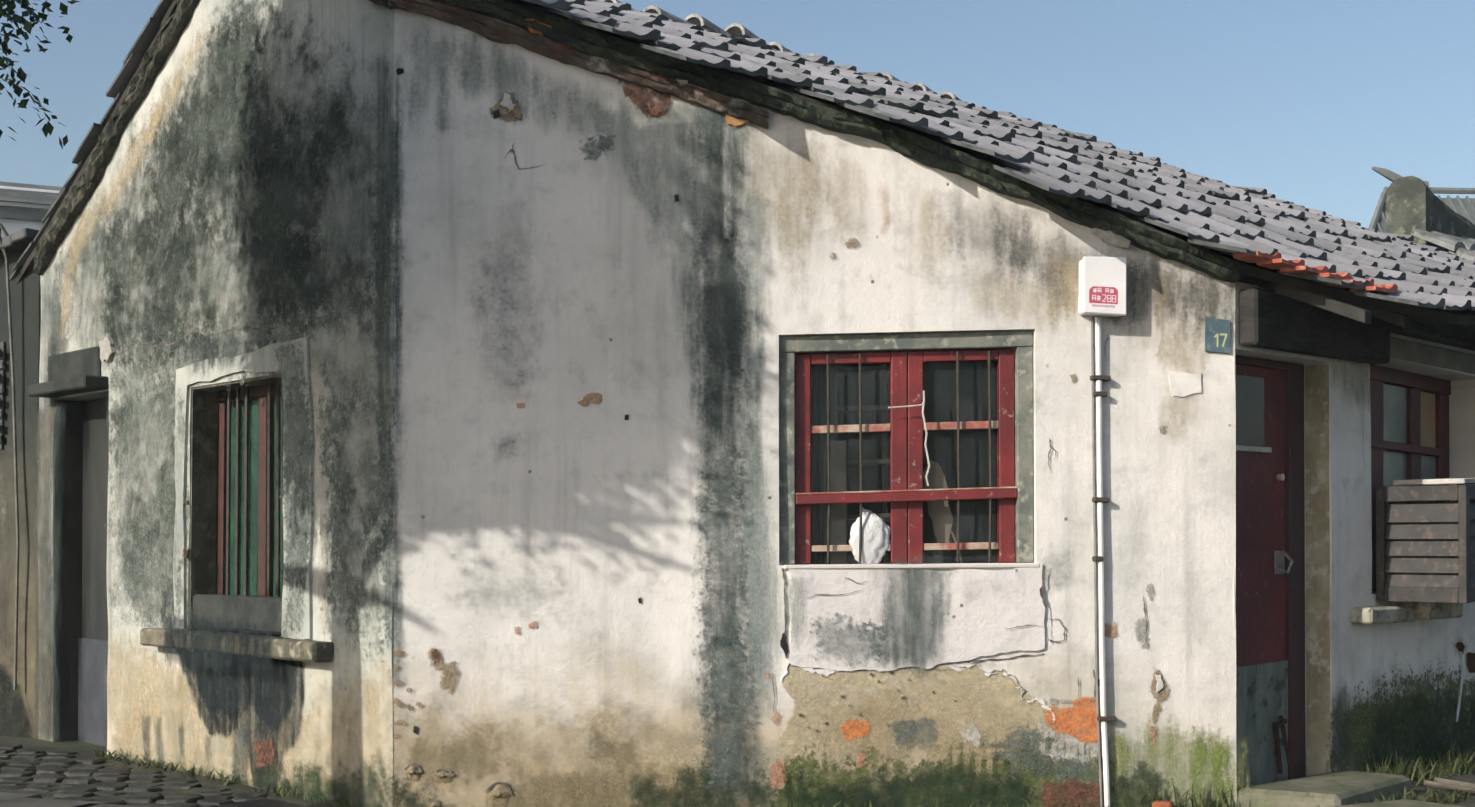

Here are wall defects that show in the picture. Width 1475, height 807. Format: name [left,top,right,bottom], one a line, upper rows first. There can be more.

flaking render [489,93,522,122]
flaking render [619,69,689,118]
leakage [59,0,418,801]
flaking render [578,393,602,407]
leakage [507,91,803,807]
flaking render [428,648,460,693]
crack [764,567,1066,725]
flaking render [769,662,1104,807]
flaking render [1150,670,1170,744]